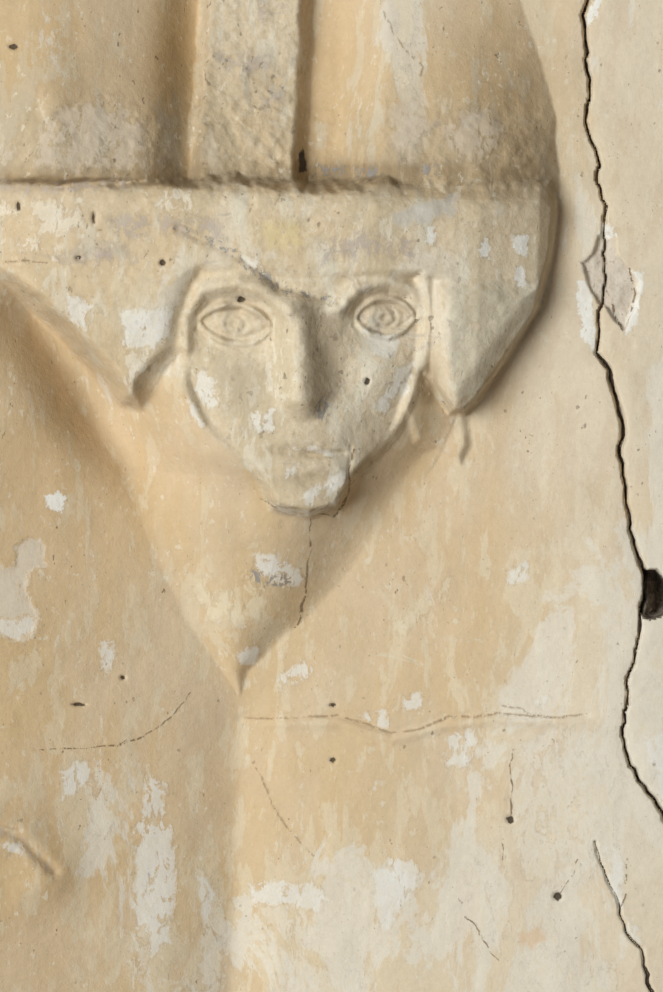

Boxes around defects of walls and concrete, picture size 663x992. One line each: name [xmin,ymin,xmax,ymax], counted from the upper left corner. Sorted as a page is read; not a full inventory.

peeling [62,292,95,333]
peeling [117,301,176,405]
spalling [575,220,645,365]
crack [582,0,663,816]
peeling [0,536,50,647]
crack [294,449,355,628]
peeling [58,758,230,992]
peeling [247,879,333,950]
crack [575,844,654,992]